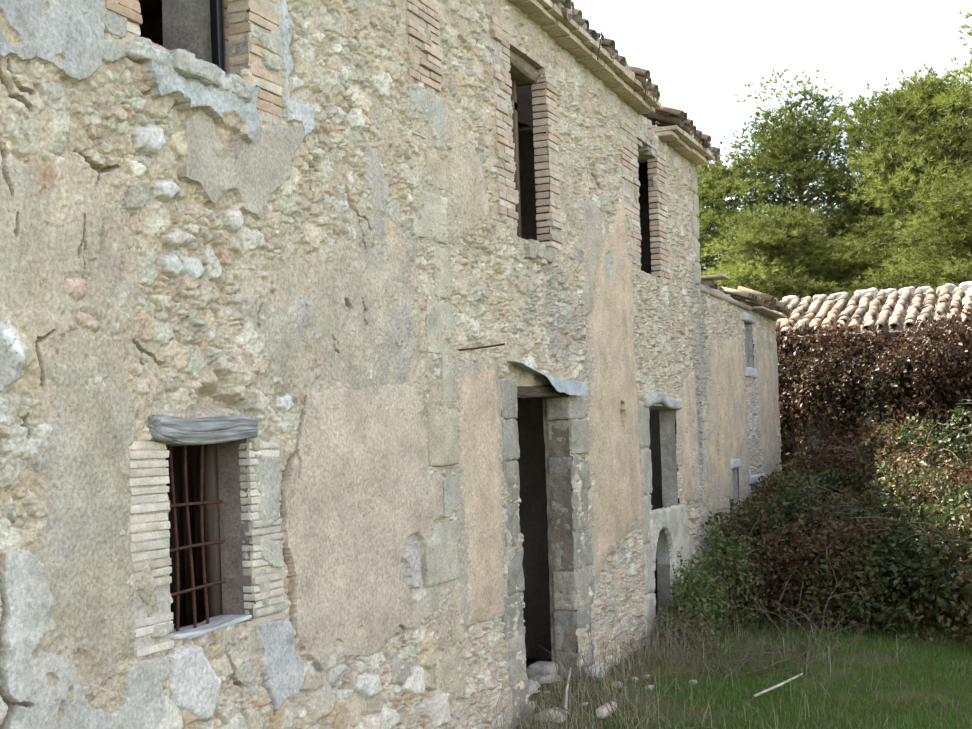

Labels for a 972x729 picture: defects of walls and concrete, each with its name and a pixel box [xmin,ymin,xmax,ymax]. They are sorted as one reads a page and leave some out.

peeling [0,332,171,729]
spalling [0,0,414,407]
peeling [182,255,444,729]
spalling [439,0,560,729]
peeling [554,64,719,670]
peeling [710,335,746,553]